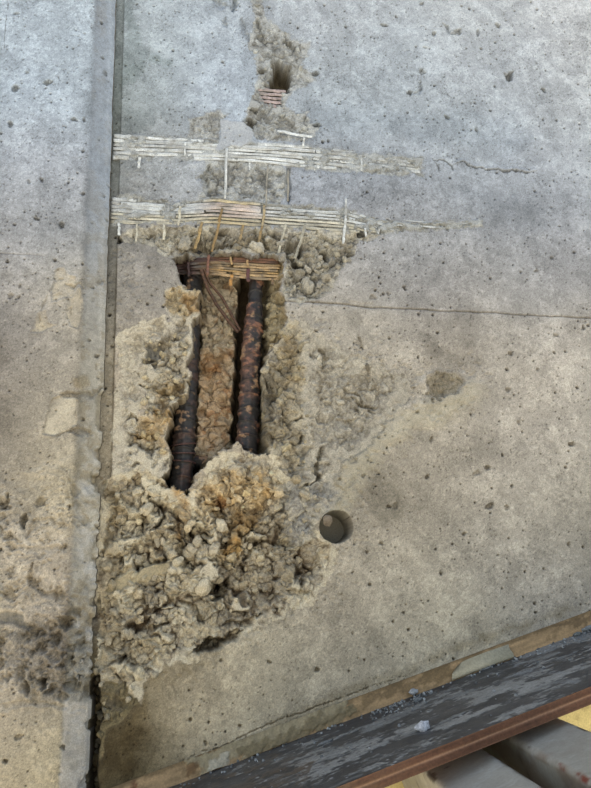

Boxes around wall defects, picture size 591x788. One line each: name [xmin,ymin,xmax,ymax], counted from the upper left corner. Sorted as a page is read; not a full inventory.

spalling [110,0,428,229]
crack [429,156,537,176]
crack [286,298,591,322]
spalling [0,206,488,780]